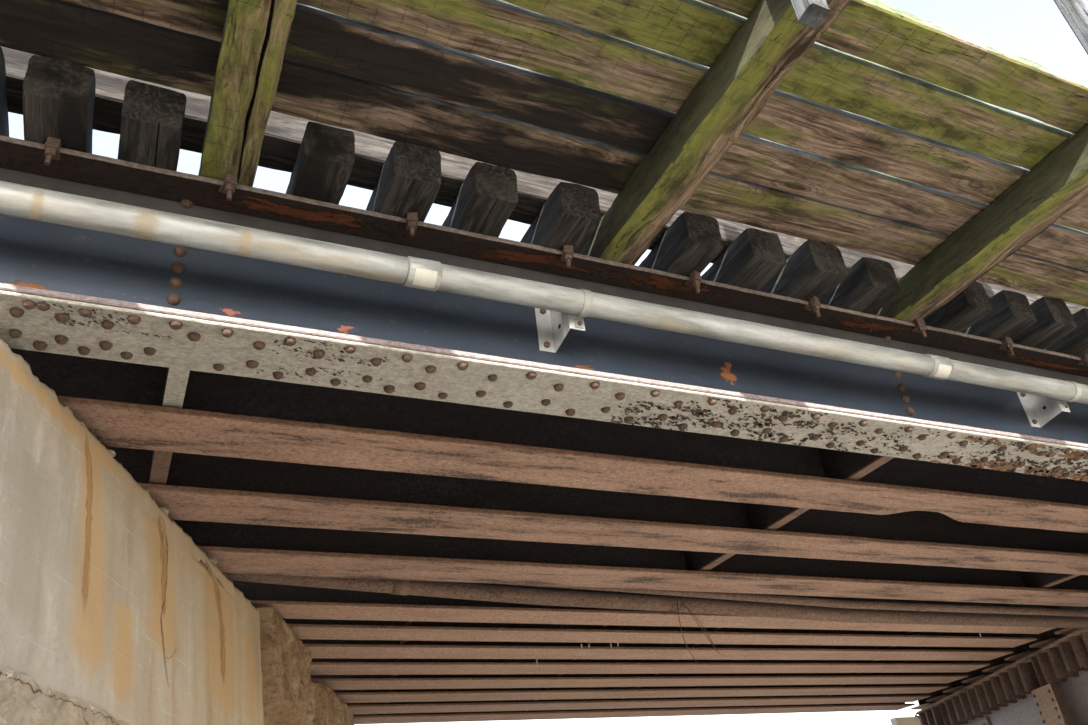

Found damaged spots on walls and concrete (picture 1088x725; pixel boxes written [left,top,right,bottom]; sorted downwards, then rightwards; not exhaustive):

rust [217,196,362,228]
rust [720,362,737,385]
rust [609,397,1088,482]
rust [0,341,262,725]
crack [160,517,177,685]
crack [0,668,123,725]